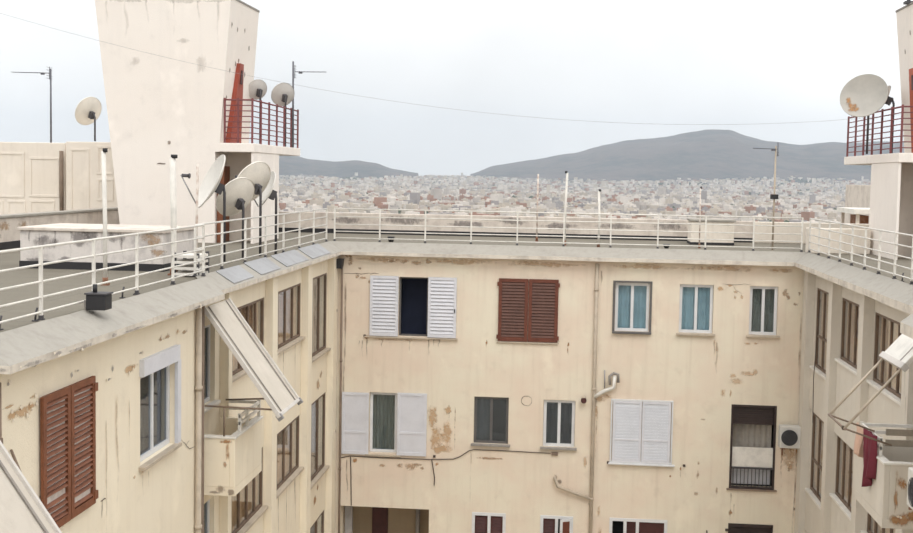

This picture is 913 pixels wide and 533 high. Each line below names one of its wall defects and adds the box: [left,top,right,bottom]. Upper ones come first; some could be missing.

peeling [6,393,38,422]
peeling [427,406,456,453]